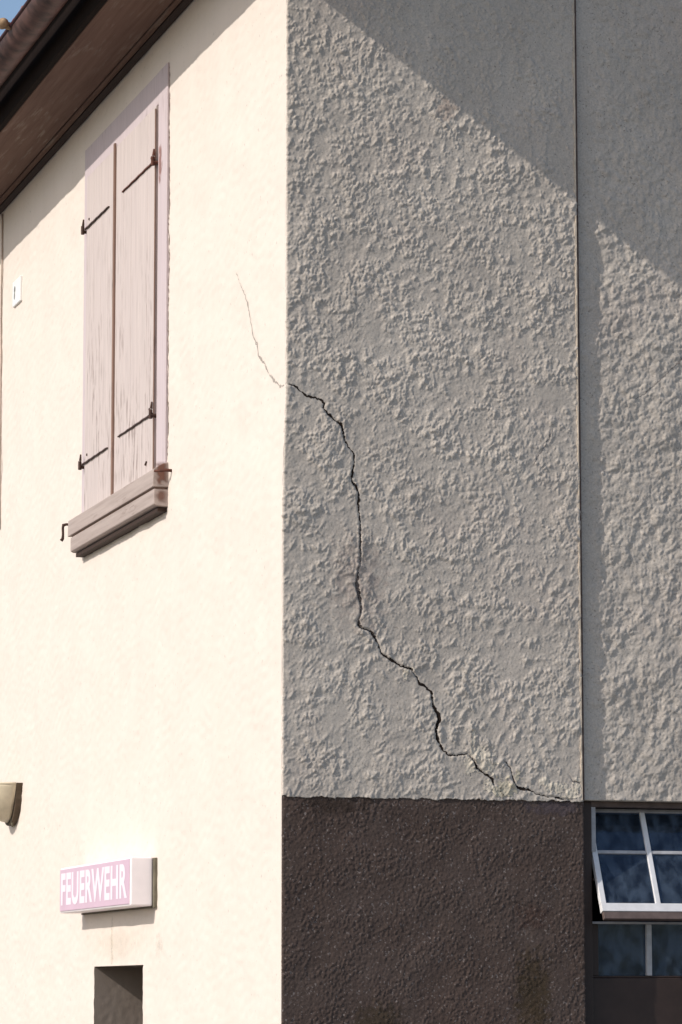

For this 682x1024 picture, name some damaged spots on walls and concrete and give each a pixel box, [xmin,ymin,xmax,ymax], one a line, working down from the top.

crack [236,274,580,801]